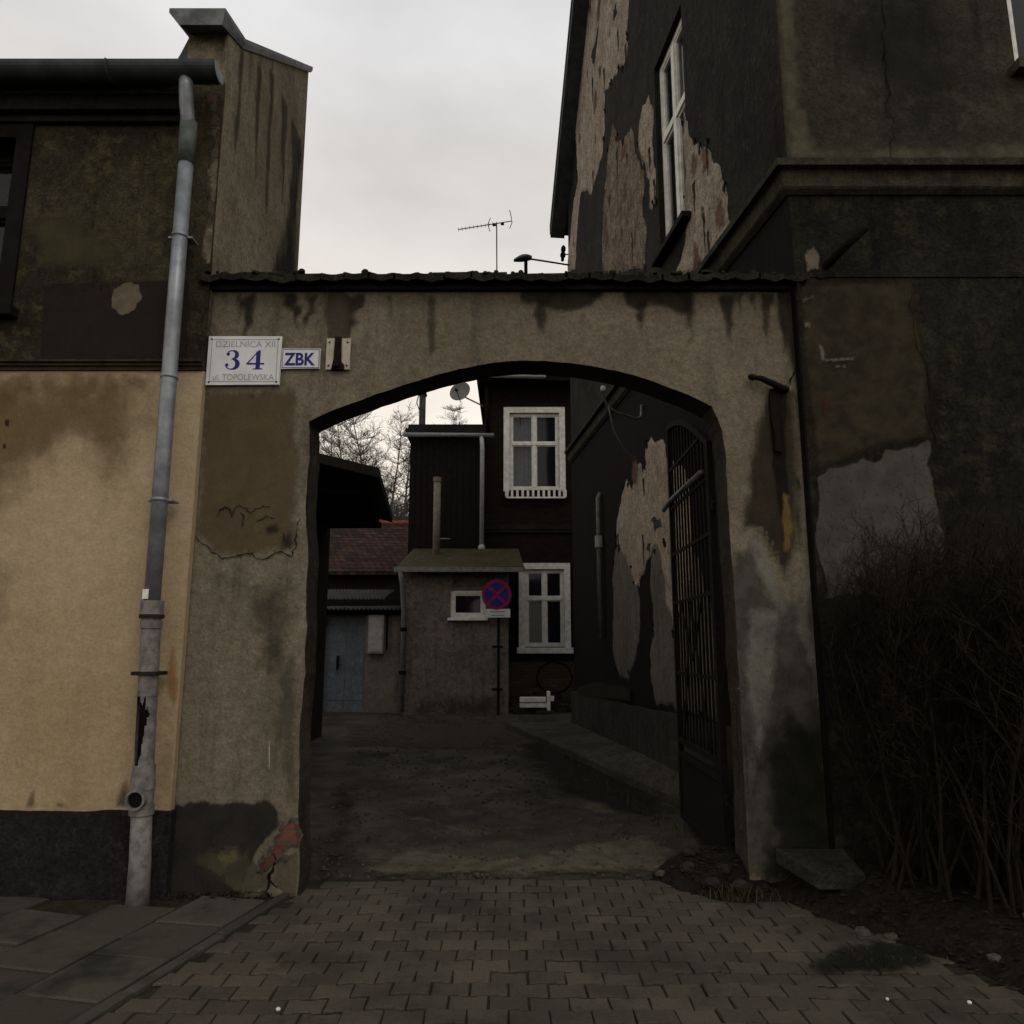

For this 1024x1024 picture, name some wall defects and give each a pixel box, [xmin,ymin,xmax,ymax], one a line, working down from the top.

leakage [235,50,244,146]
leakage [256,65,301,274]
peeling [568,0,657,273]
peeling [676,111,730,275]
peeling [112,282,142,315]
leakage [284,292,364,338]
leakage [521,292,602,327]
leakage [624,292,694,321]
corrosion [745,391,800,572]
crack [196,519,300,560]
peeling [612,438,717,722]
spalling [255,817,303,894]